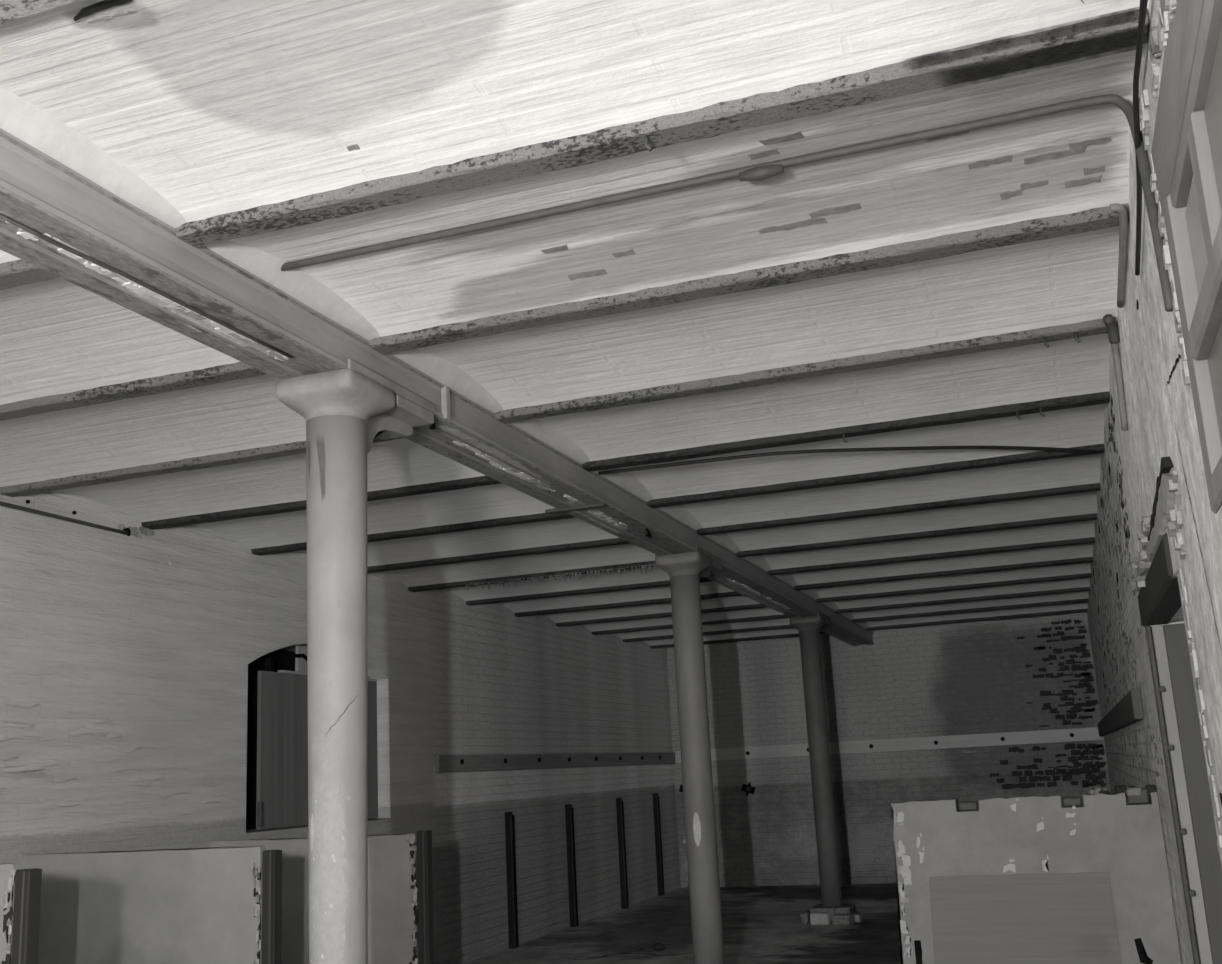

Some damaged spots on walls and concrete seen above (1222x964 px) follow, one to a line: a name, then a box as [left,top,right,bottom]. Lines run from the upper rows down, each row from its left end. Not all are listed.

spalling [74,0,137,23]
spalling [1017,394,1222,853]
peeling [990,725,1163,835]